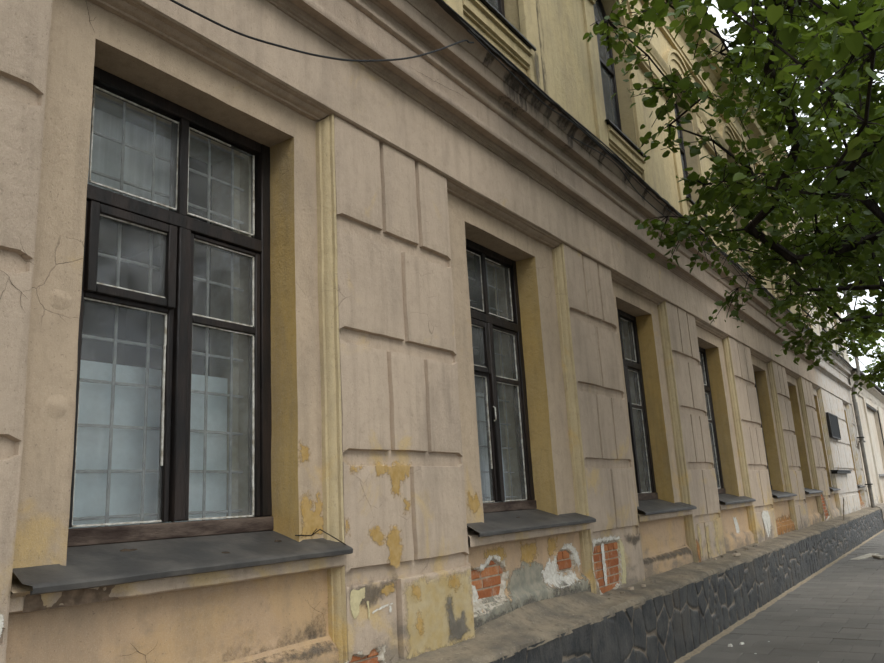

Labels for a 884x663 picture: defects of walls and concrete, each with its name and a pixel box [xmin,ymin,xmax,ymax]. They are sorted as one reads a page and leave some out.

peeling [375,460,412,510]
peeling [369,526,404,568]
flaking render [541,535,627,595]
flaking render [23,585,120,612]
peeling [350,583,395,619]
peeling [405,547,509,659]
damp [446,561,591,641]
flaking render [346,645,388,663]